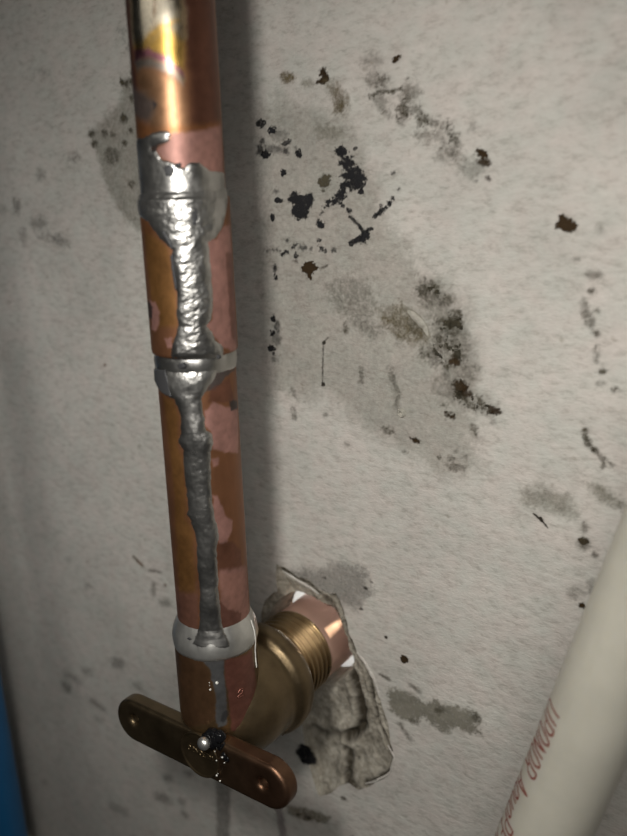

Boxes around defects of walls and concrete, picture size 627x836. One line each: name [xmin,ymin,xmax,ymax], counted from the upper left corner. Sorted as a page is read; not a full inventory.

water stain [316,68,347,112]
water stain [373,88,428,125]
water stain [476,149,490,166]
water stain [382,309,423,340]
water stain [452,380,501,416]
flaking render [261,564,395,796]
water stain [389,690,480,734]